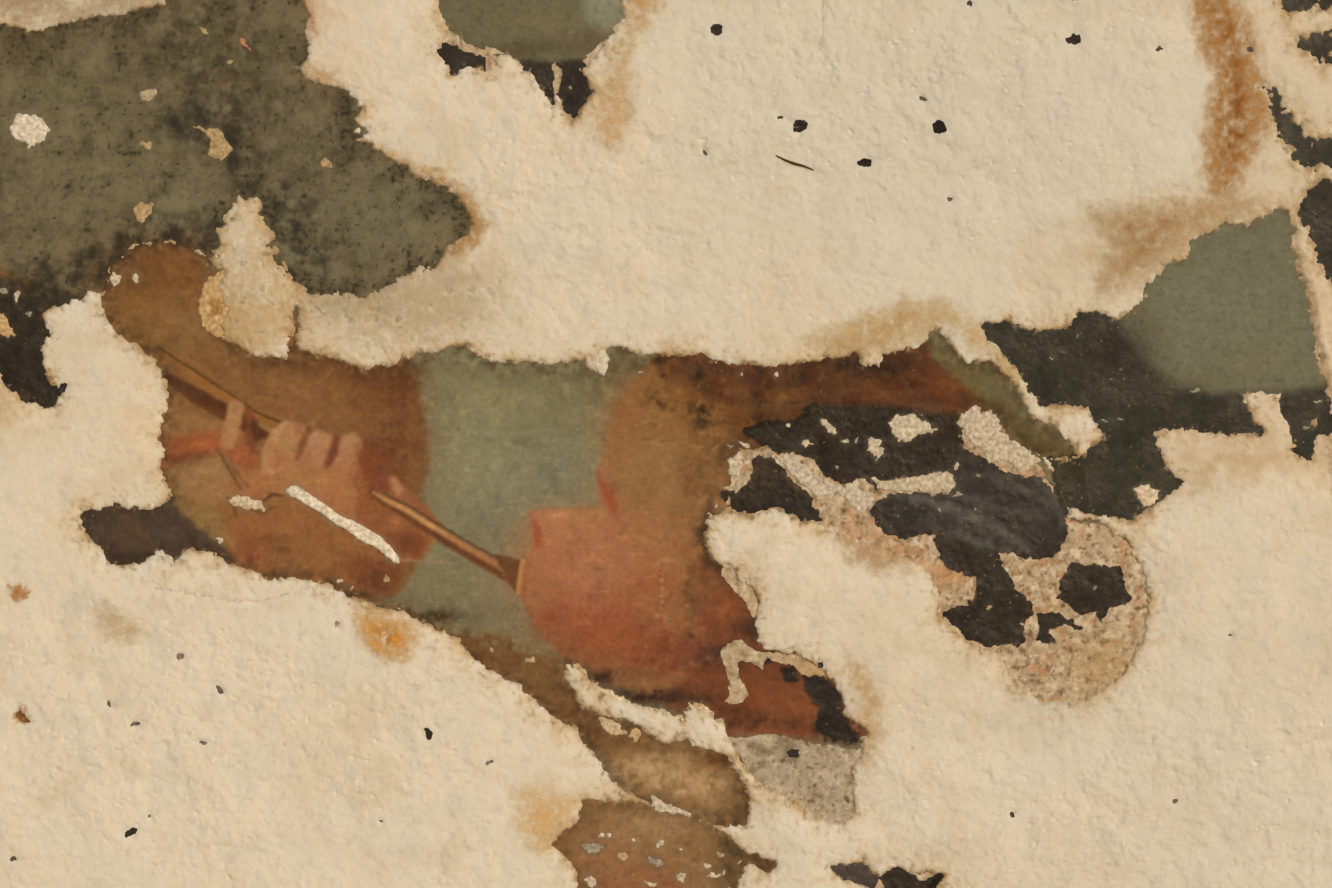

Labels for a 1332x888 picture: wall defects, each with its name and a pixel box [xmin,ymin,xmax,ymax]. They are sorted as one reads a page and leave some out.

peeling [437,0,626,118]
peeling [1281,0,1332,12]
peeling [1297,29,1332,64]
peeling [1262,86,1332,172]
peeling [0,0,473,409]
peeling [1297,178,1332,282]
peeling [80,208,1332,888]